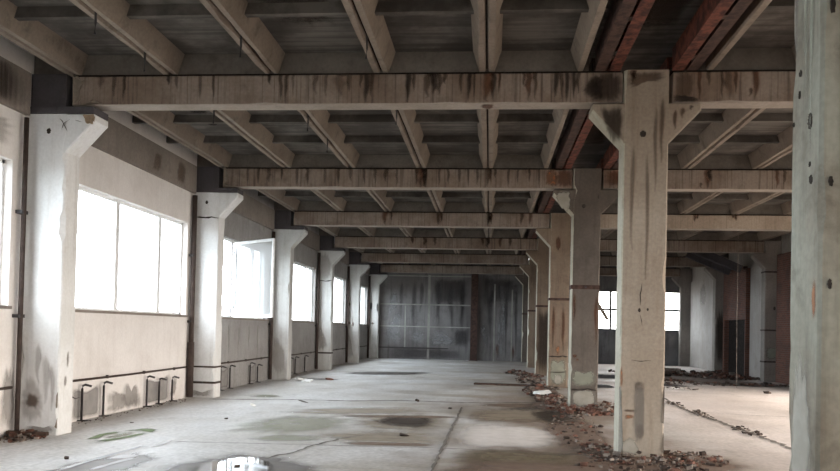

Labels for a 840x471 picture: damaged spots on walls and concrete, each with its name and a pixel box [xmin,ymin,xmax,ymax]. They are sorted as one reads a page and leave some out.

leakage [554,73,620,100]
leakage [585,109,621,143]
corrosion [552,296,575,353]
leakage [113,386,137,409]